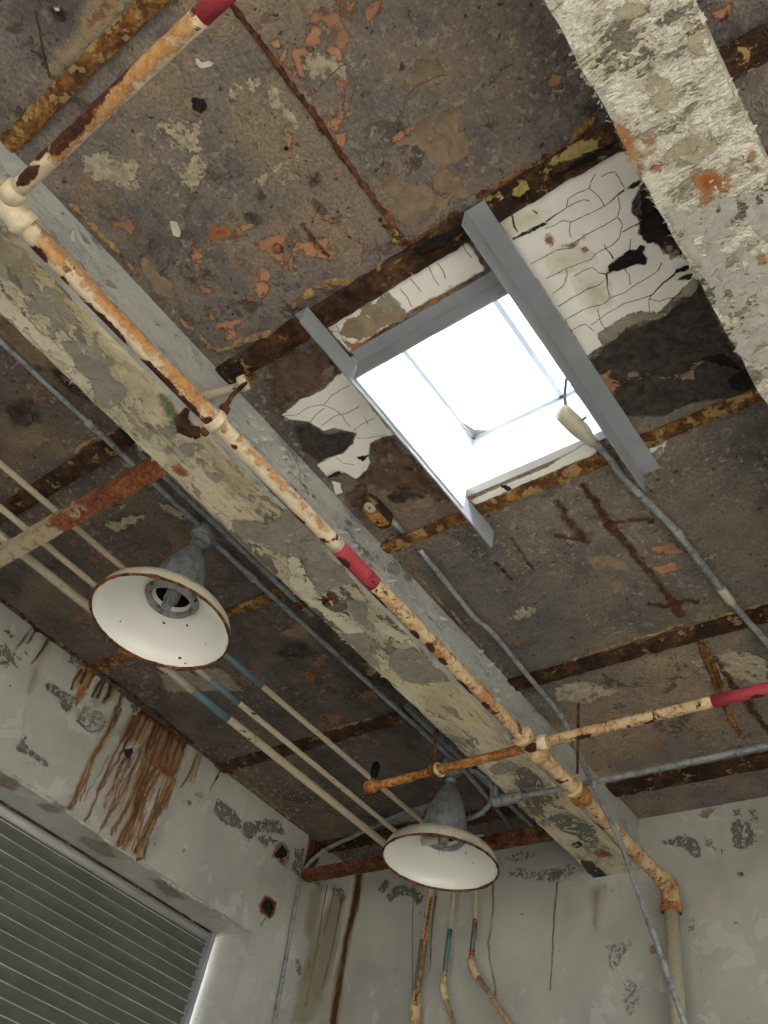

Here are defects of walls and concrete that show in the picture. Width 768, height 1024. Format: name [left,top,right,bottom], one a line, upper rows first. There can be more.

peeling [228,77,301,151]
corrosion [230,3,407,249]
peeling [270,0,383,150]
peeling [381,0,768,417]
crack [511,171,675,331]
crack [281,385,385,438]
peeling [470,437,598,517]
corrosion [553,500,591,544]
corrosion [580,483,700,618]
peeling [648,439,668,460]
corrosion [67,669,200,861]